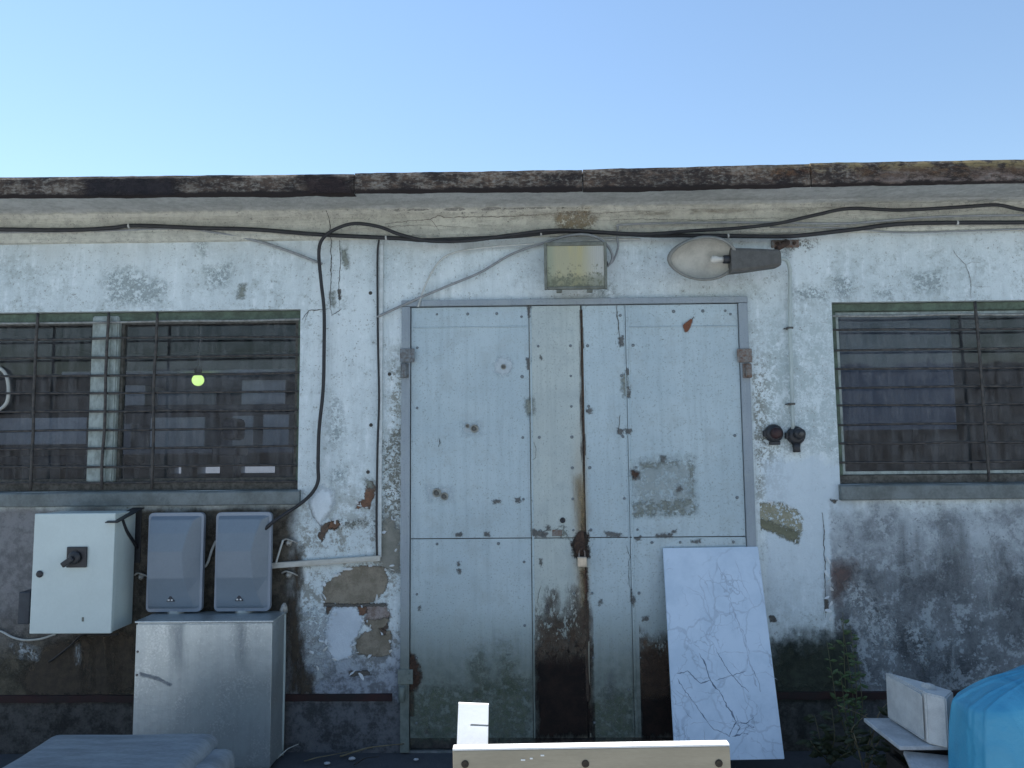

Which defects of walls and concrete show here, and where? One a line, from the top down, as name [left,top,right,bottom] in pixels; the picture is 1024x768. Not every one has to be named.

water stain [85,177,175,196]
water stain [304,177,352,193]
water stain [556,210,595,229]
spalling [301,429,400,686]
rust [535,310,595,743]
peeling [760,500,803,545]
water stain [846,581,929,665]
water stain [19,631,171,695]
rust [639,629,673,741]